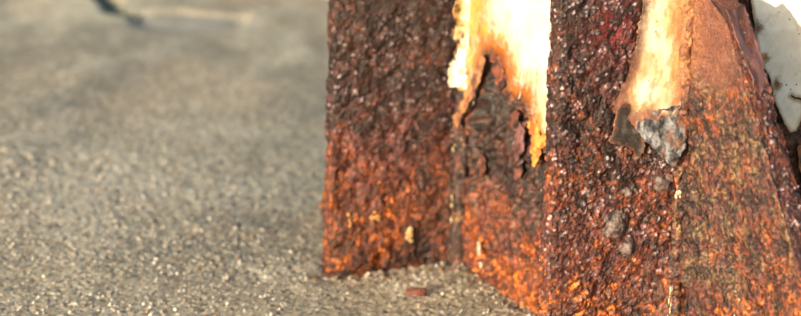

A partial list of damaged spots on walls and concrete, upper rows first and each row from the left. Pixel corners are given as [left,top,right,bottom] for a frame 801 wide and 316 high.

peeling [448,0,506,128]
corrosion [612,0,653,129]
peeling [609,0,687,166]
corrosion [668,0,694,115]
peeling [726,0,801,132]
peeling [508,110,542,198]